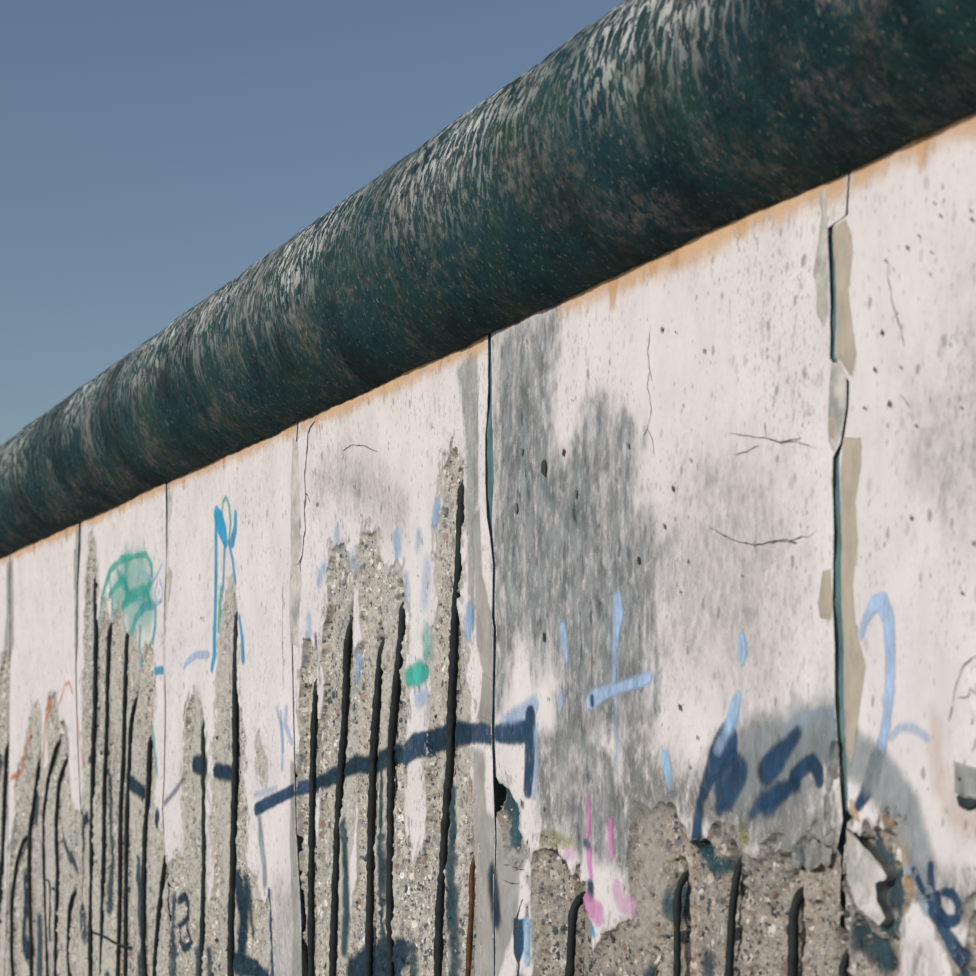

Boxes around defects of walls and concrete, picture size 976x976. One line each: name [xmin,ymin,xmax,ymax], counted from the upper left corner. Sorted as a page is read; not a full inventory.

spalling [0,528,276,976]
spalling [290,437,976,976]
crack [705,524,813,546]
crack [729,423,815,455]